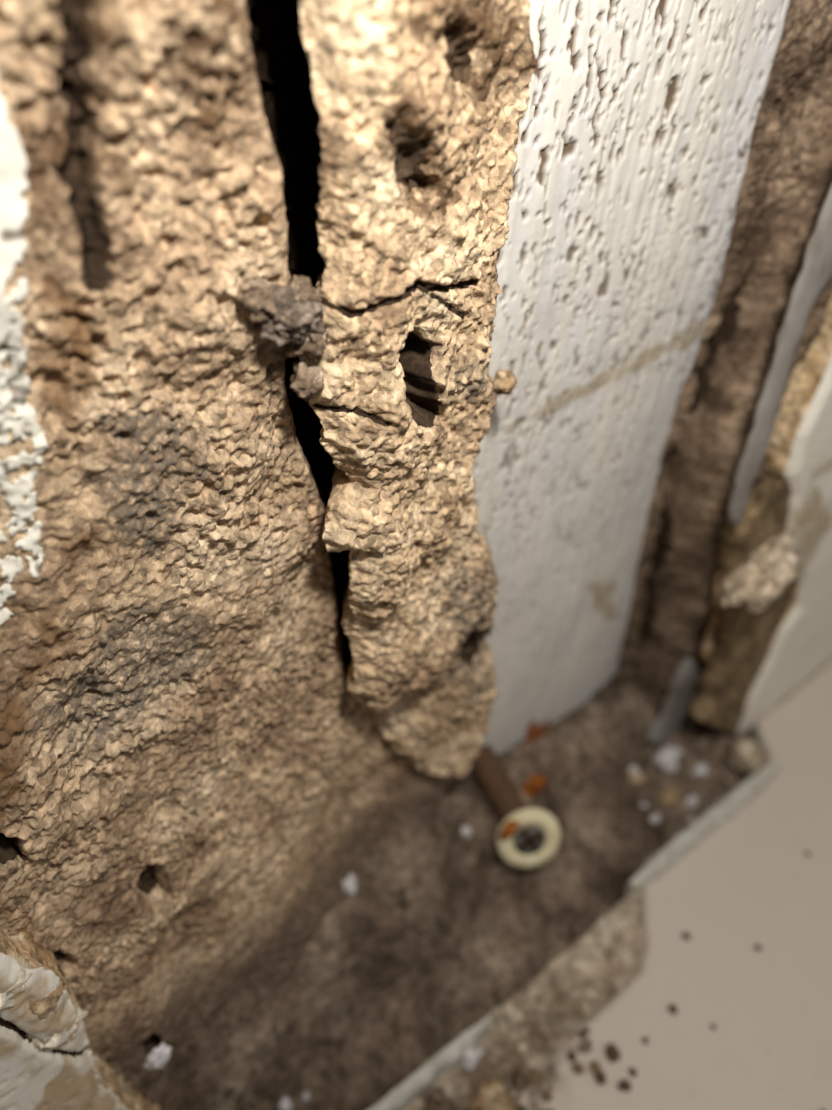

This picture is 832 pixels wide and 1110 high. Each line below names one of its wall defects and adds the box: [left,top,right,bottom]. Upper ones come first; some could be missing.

crack [58,0,115,290]
crack [245,0,478,319]
flaking render [0,0,479,1081]
crack [285,356,392,510]
crack [329,550,352,674]
flaking render [494,369,517,395]
flaking render [612,0,832,734]
crack [0,1018,85,1058]